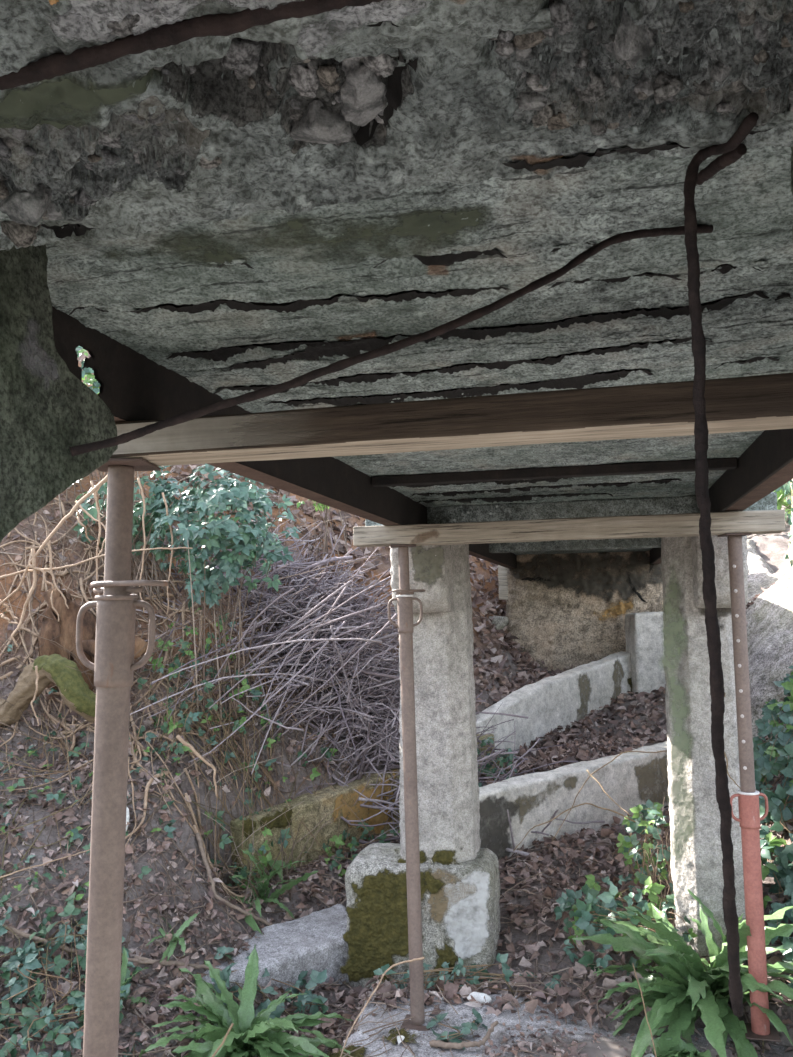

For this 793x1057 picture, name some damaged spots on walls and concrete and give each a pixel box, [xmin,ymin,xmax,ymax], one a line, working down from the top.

water stain [0,68,159,131]
spalling [0,0,425,248]
crack [484,139,709,171]
crack [749,111,793,135]
water stain [143,207,487,268]
crack [551,242,596,252]
crack [55,249,508,315]
spalling [69,226,685,456]
crack [166,261,793,407]
spalling [489,0,793,1017]
peeling [444,871,489,959]